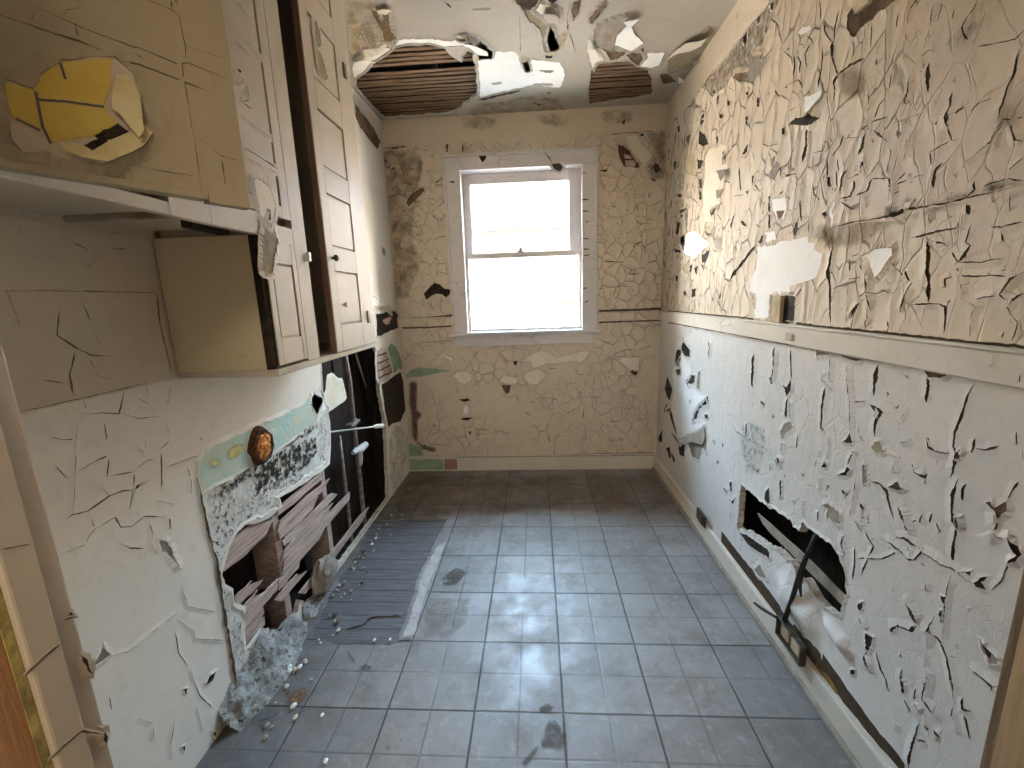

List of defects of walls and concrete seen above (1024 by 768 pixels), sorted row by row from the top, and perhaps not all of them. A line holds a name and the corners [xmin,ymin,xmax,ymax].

peeling [0,43,163,177]
crack [0,0,277,194]
peeling [345,0,719,174]
crack [19,291,237,763]
corrosion [257,433,271,459]
damp [211,425,318,497]
peeling [194,293,475,689]
crack [402,311,453,345]
crack [426,394,691,465]
peeling [658,339,710,463]
crack [549,0,1024,768]
spalling [728,455,865,621]